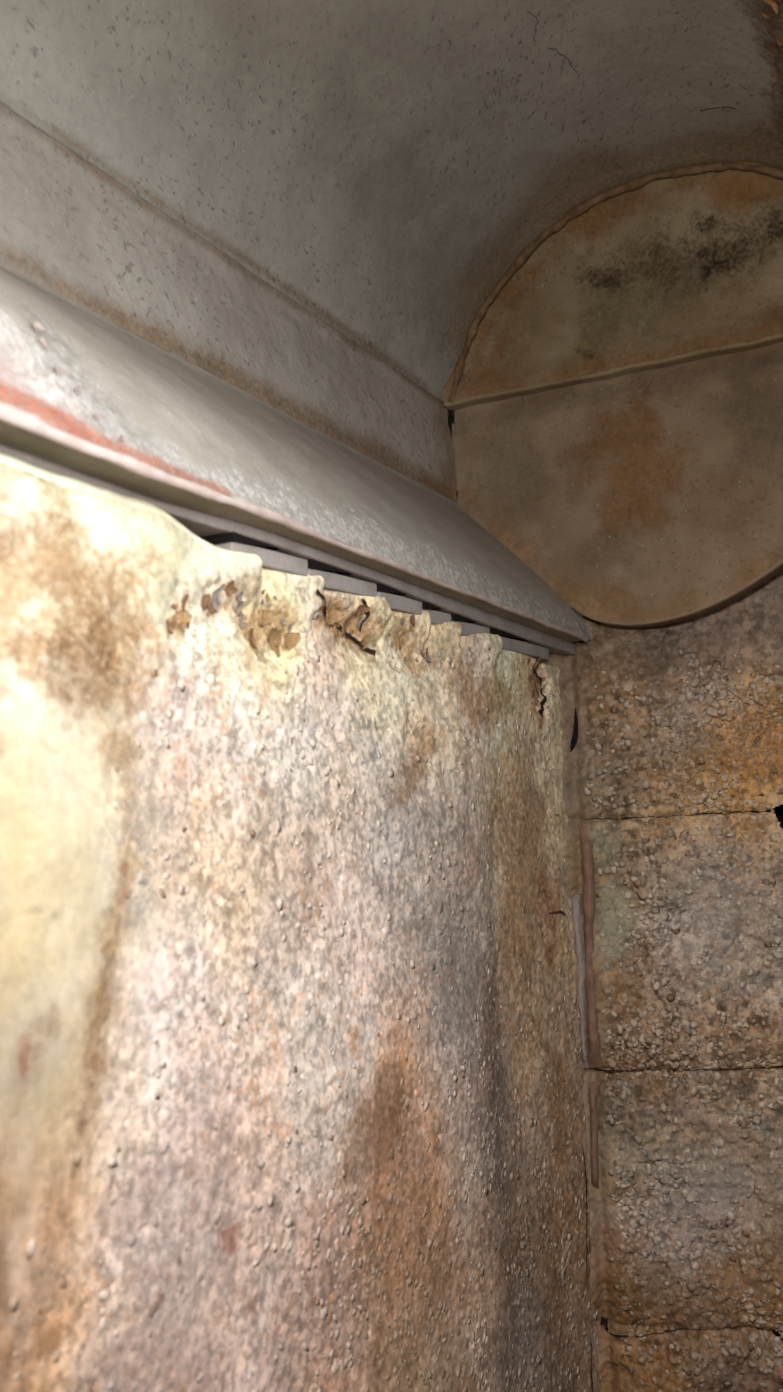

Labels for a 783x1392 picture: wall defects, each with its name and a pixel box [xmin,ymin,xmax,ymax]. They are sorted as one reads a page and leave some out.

corrosion [0,383,231,496]
corrosion [0,490,135,762]
spalling [166,574,303,657]
peeling [316,588,431,671]
crack [580,1143,588,1285]
crack [591,1316,773,1392]